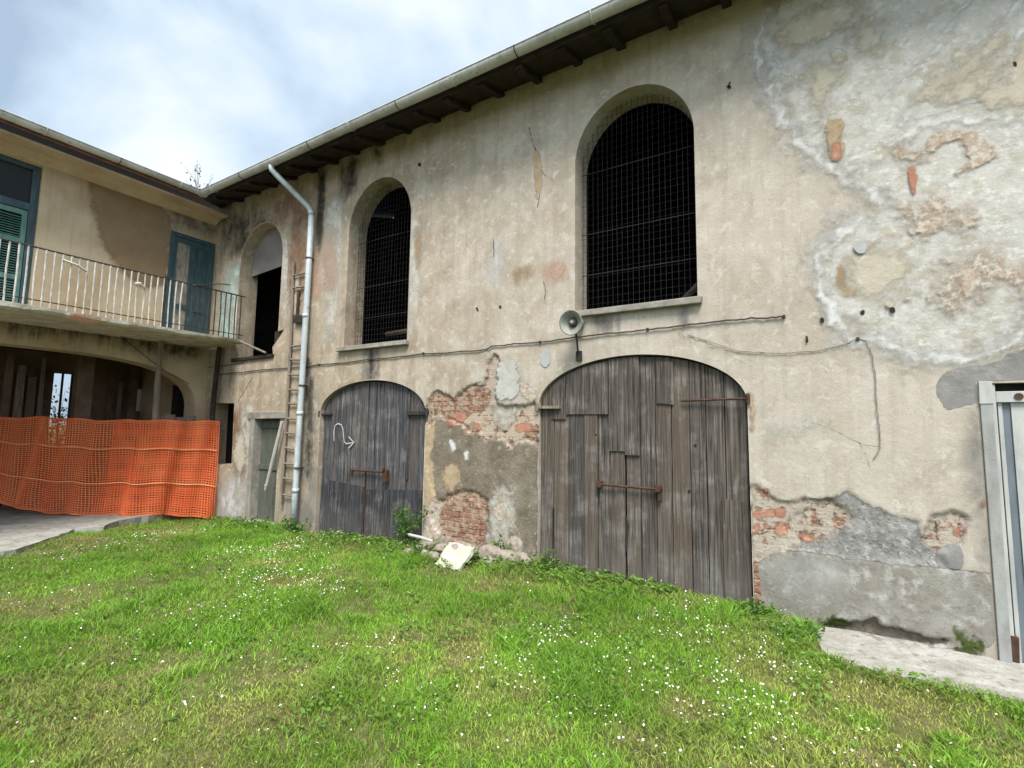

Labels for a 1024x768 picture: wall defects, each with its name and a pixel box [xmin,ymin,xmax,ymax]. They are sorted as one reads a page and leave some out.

water stain [90,182,171,287]
peeling [752,0,1024,370]
spalling [423,353,539,557]
flaking render [751,484,853,604]
flaking render [921,510,970,550]
spalling [818,615,985,655]